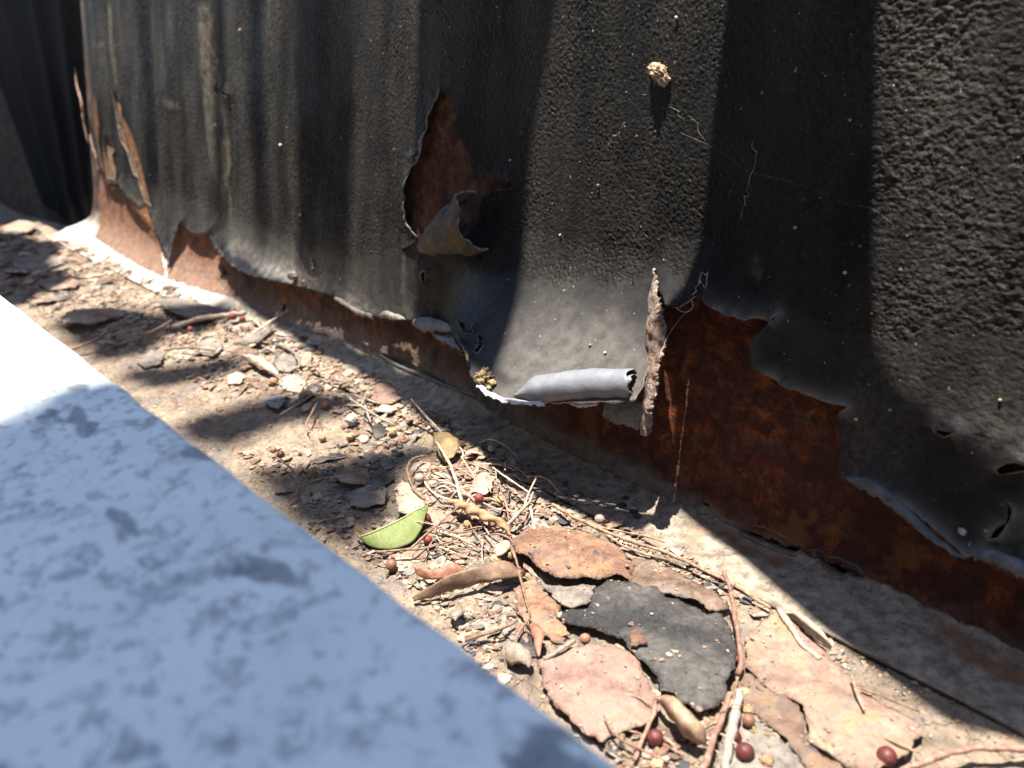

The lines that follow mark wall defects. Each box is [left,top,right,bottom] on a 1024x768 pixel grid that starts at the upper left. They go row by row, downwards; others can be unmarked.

peeling [74,67,99,171]
peeling [400,89,512,257]
corrosion [60,307,126,325]
corrosion [94,119,1024,652]
peeling [476,268,667,437]
peeling [846,476,1024,579]